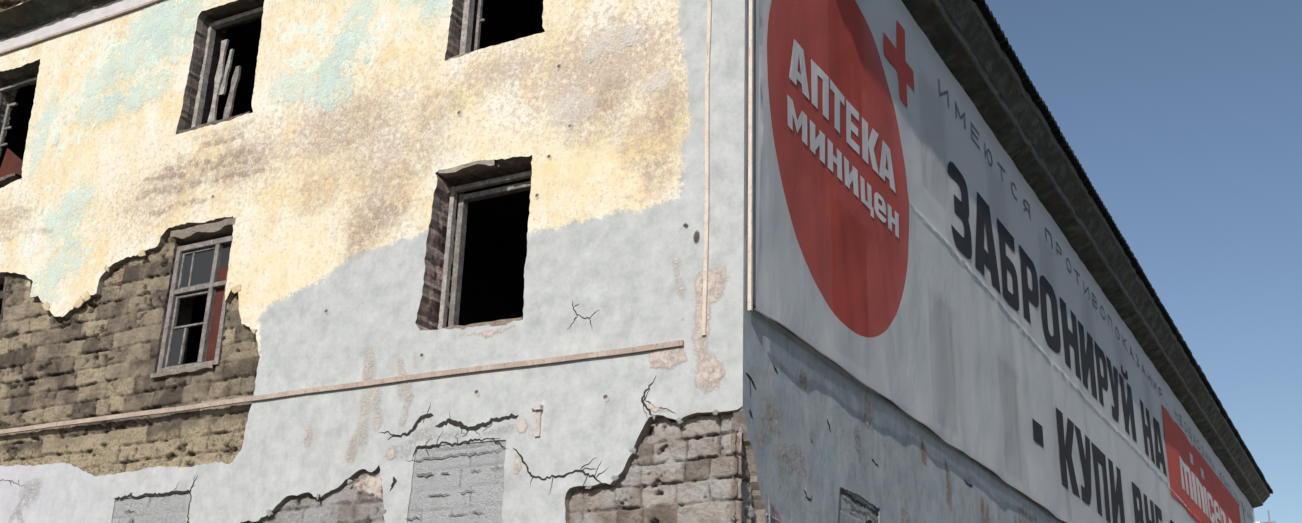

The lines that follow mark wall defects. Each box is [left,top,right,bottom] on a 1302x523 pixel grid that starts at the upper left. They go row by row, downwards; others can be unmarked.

flaking render [0,225,260,476]
crack [569,301,598,328]
crack [641,376,675,416]
peeling [649,258,727,392]
flaking render [249,427,451,523]
crack [379,407,604,520]
flaking render [569,404,783,523]